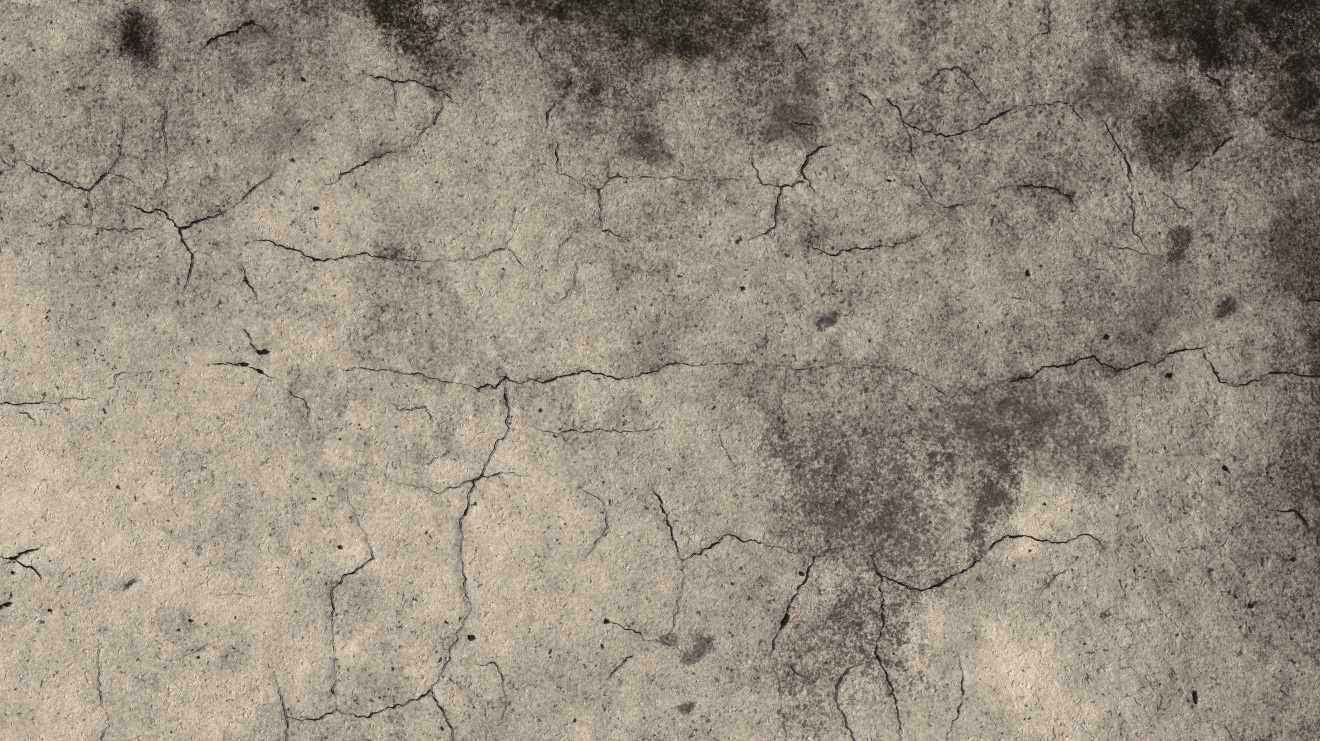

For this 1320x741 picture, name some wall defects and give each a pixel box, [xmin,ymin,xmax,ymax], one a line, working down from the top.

crack [0,99,274,292]
crack [199,21,266,52]
crack [326,75,459,185]
crack [546,100,835,304]
crack [807,66,1320,290]
crack [212,206,526,424]
crack [273,346,1320,741]
crack [96,641,109,739]